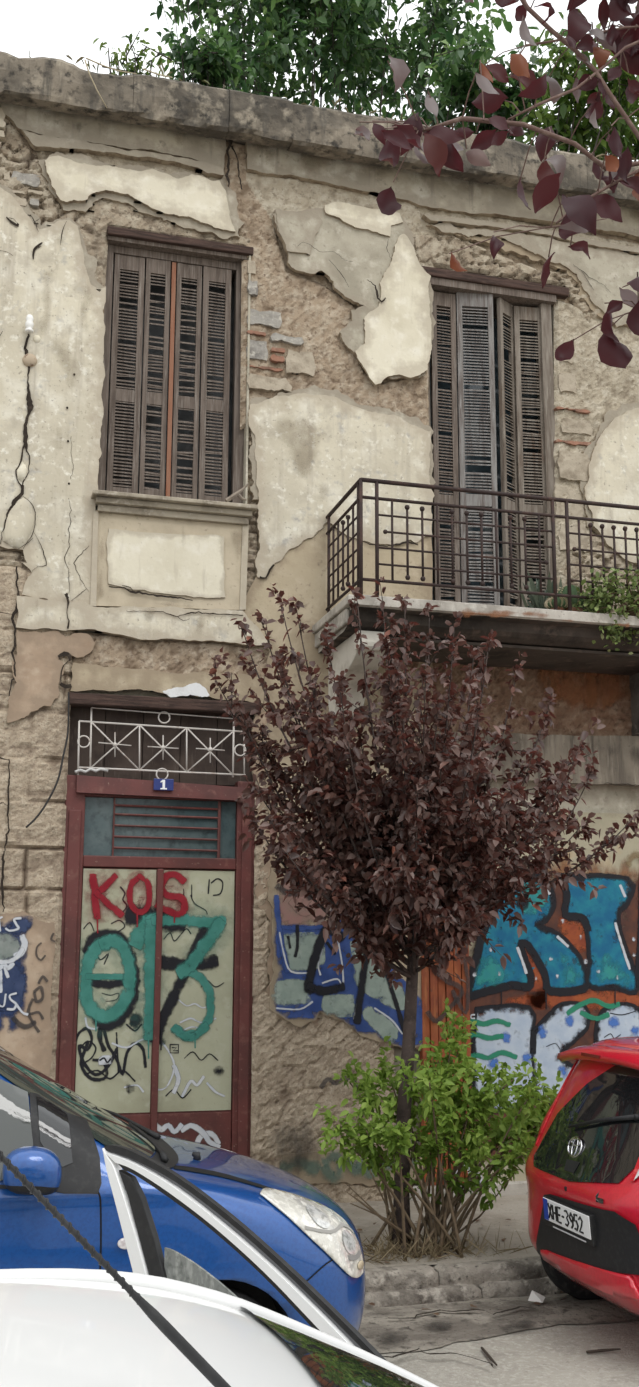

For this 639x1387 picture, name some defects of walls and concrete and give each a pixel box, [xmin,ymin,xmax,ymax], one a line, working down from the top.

crack [225,140,242,190]
crack [0,331,243,696]
spalling [72,632,269,679]
flaking render [0,118,639,615]